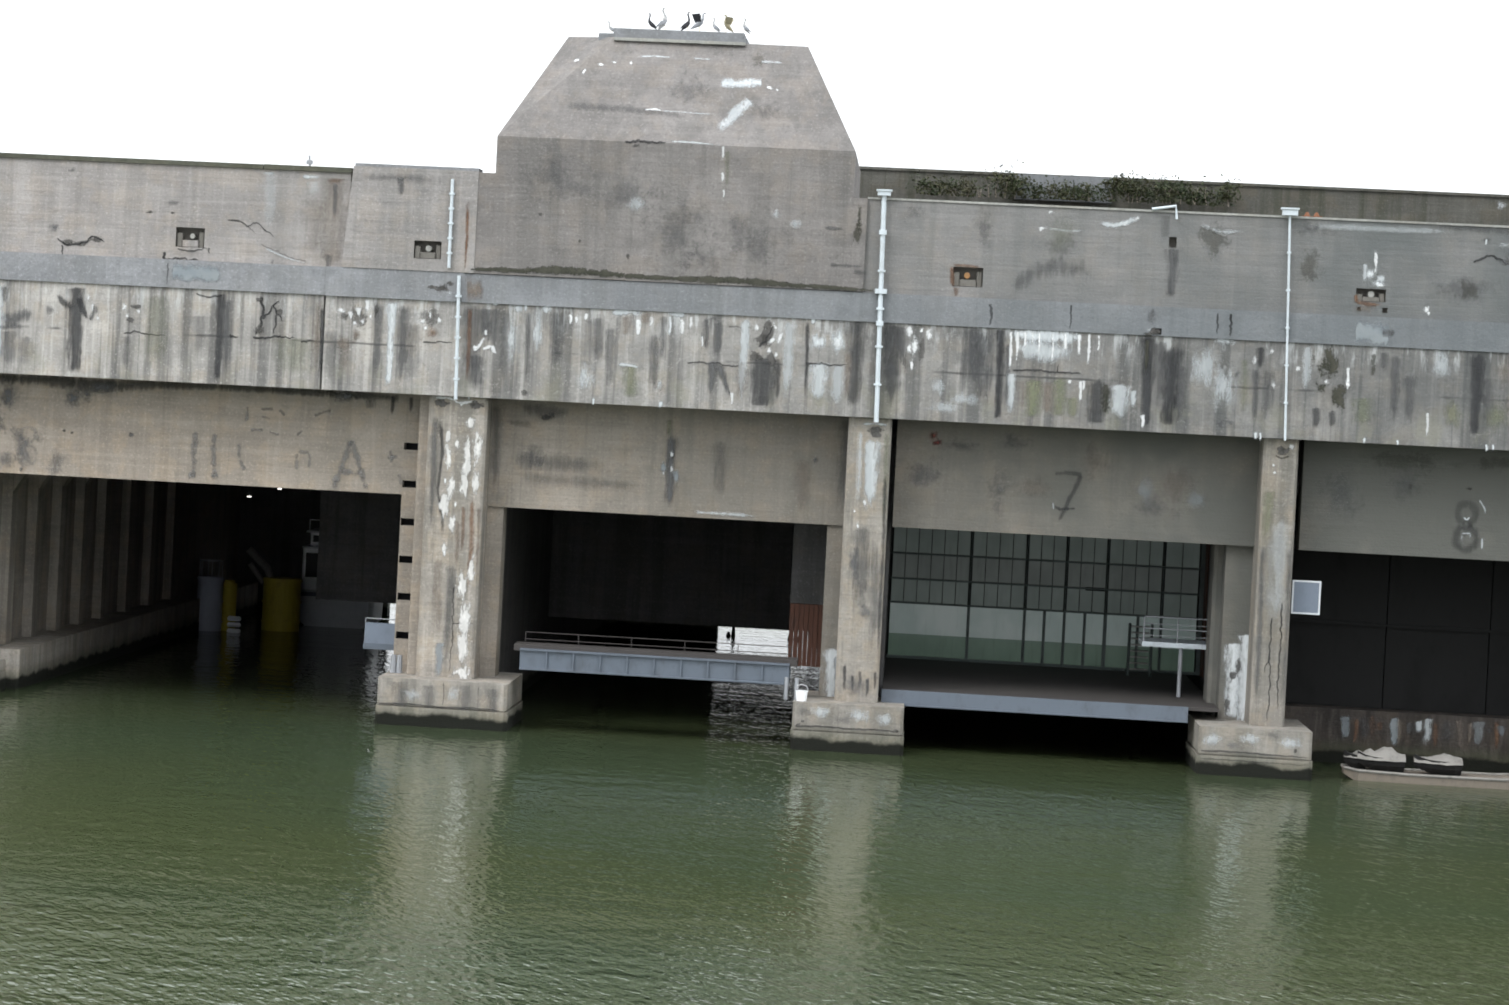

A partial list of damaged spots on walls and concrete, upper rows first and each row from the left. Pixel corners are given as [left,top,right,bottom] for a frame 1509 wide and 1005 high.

water stain [0,287,412,413]
water stain [472,304,550,381]
water stain [613,310,779,405]
water stain [804,319,827,397]
water stain [848,322,861,402]
water stain [965,330,1264,426]
water stain [1313,408,1333,425]
water stain [1371,353,1399,412]
water stain [1449,355,1502,450]
peeling [435,396,484,557]
peeling [453,555,475,679]
peeling [1224,635,1249,720]